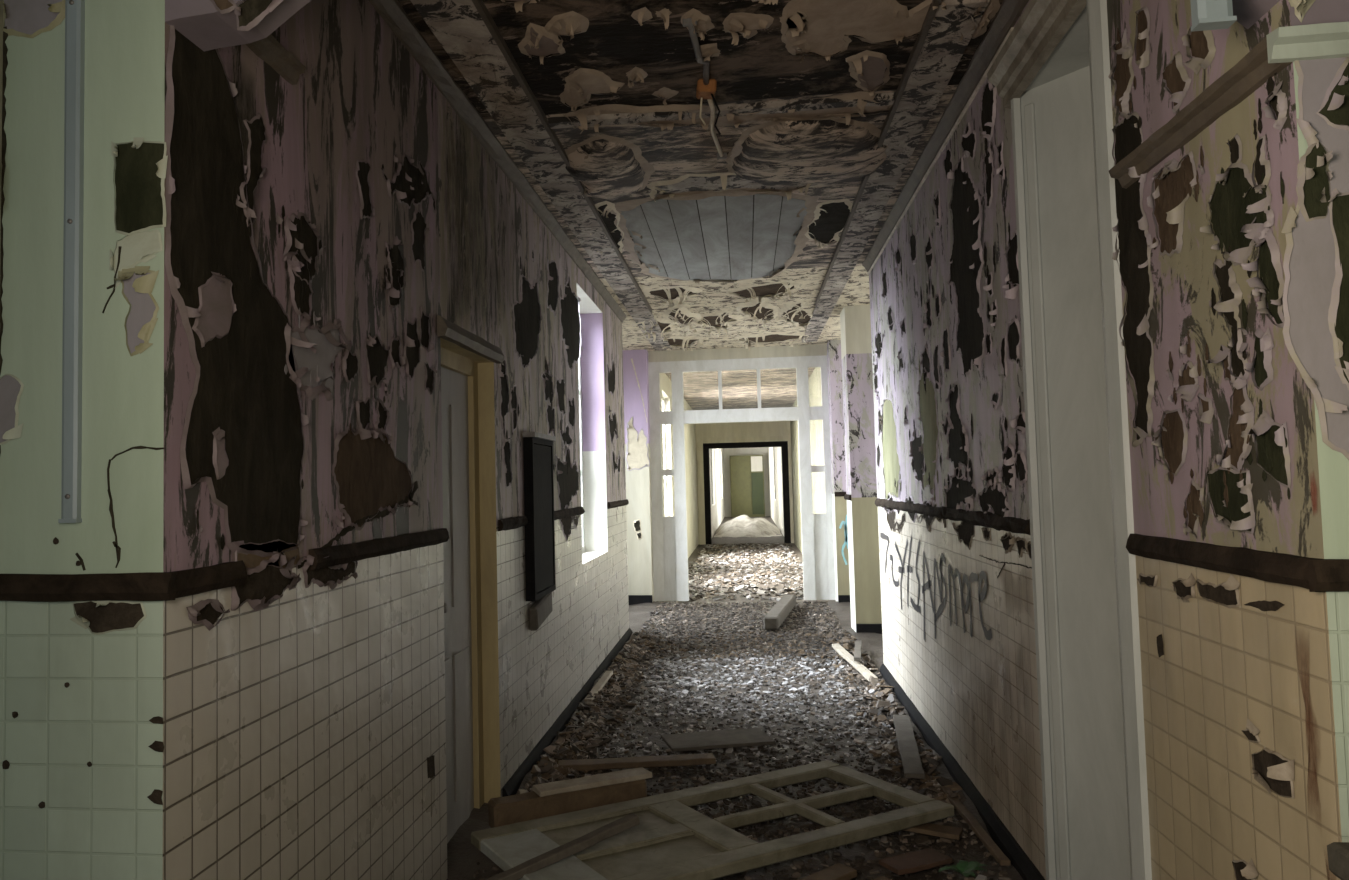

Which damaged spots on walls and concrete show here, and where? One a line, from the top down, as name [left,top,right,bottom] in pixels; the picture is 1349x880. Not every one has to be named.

peeling [501,0,589,64]
peeling [559,0,947,134]
peeling [1288,0,1315,23]
peeling [109,25,437,631]
spalling [595,201,813,351]
peeling [872,81,1032,560]
peeling [1108,6,1349,539]
peeling [498,252,583,542]
crack [75,446,165,571]
spalling [70,600,147,635]
spalling [1242,718,1295,799]
spalling [1232,858,1259,880]